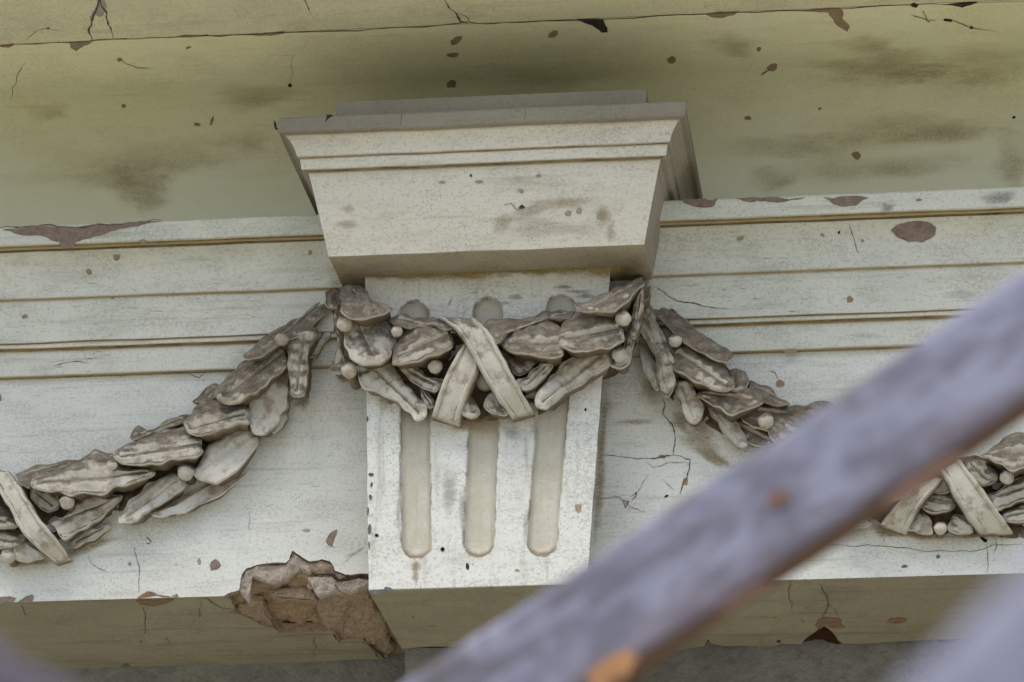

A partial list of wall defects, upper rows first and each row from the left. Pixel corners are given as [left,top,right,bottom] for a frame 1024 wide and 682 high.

crack [0,0,1018,95]
flaking render [0,219,159,249]
peeling [890,221,936,242]
crack [658,288,726,309]
crack [600,399,690,512]
flaking render [232,552,411,658]